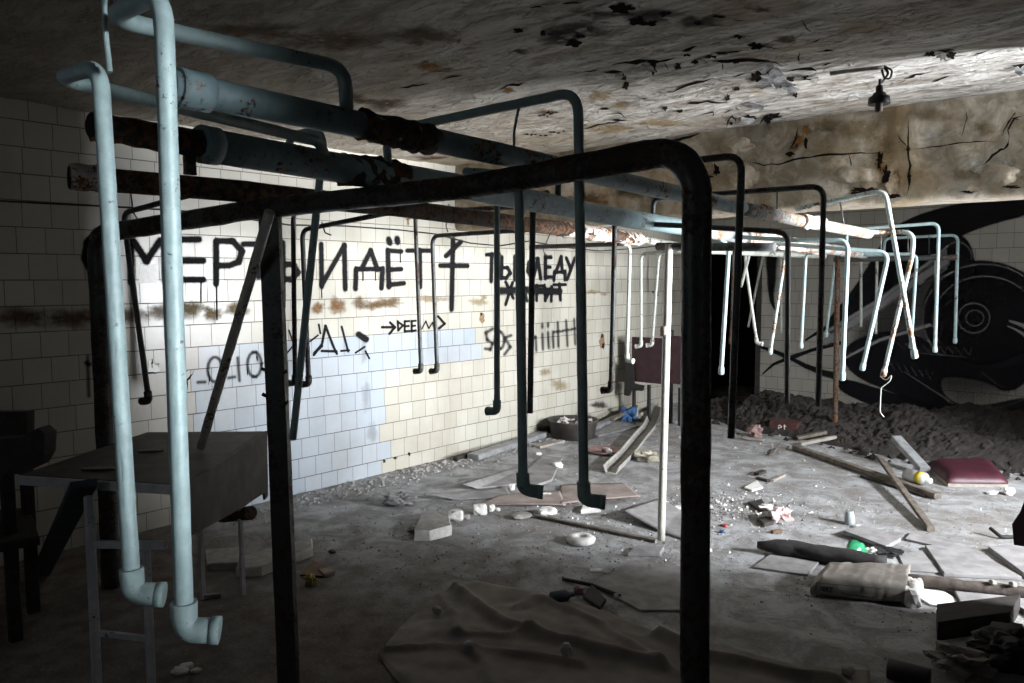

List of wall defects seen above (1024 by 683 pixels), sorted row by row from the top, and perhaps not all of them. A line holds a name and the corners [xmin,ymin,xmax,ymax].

peeling [609,3,672,26]
peeling [565,34,586,47]
peeling [585,34,832,98]
peeling [923,49,957,61]
peeling [704,101,788,125]
crack [743,152,878,166]
crack [898,107,1021,196]
corrosion [312,297,397,313]